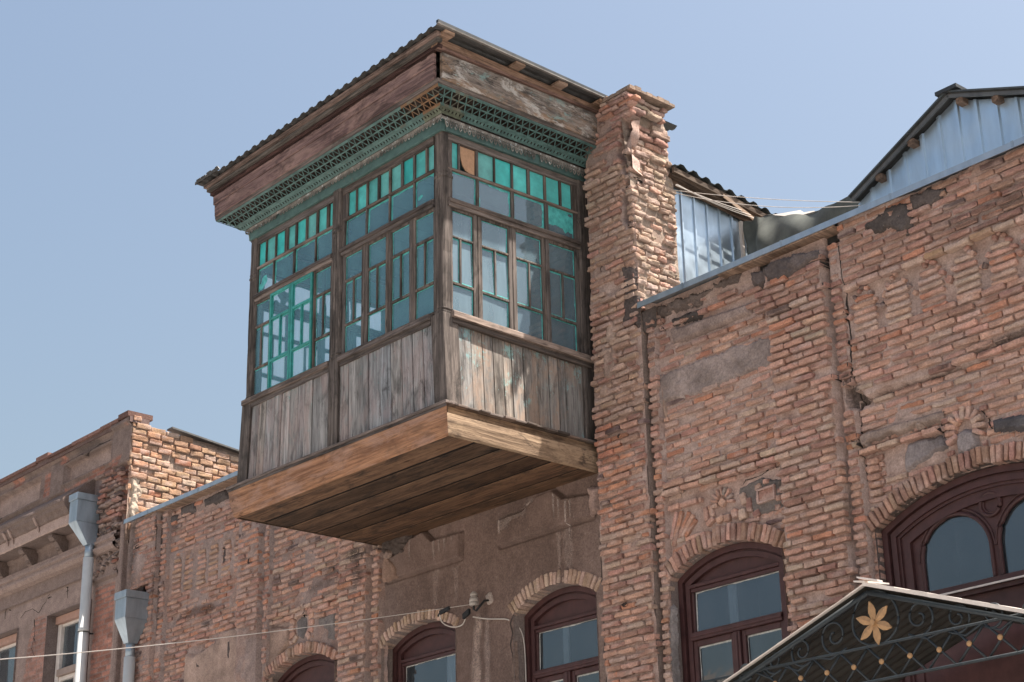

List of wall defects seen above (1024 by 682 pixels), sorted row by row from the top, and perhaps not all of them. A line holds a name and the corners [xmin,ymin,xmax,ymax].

crack [820,246,868,475]